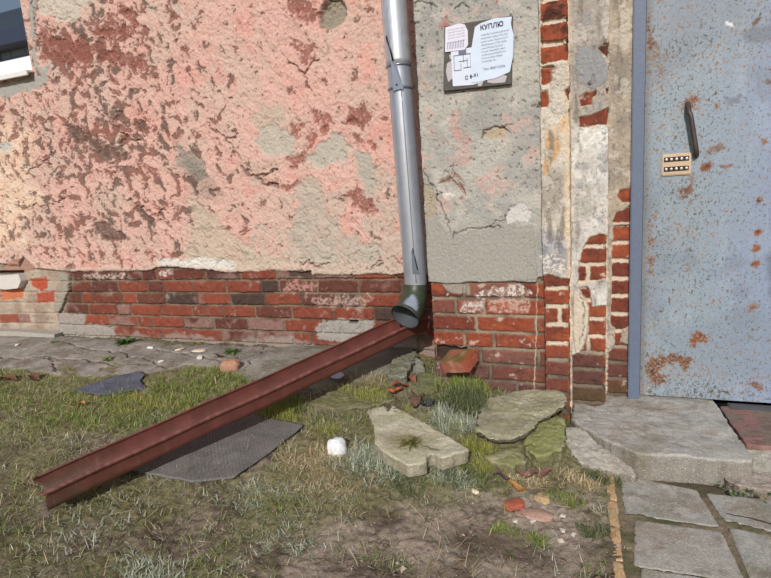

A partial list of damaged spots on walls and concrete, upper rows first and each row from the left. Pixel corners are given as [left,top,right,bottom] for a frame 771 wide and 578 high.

spalling [281,0,347,30]
spalling [536,0,571,109]
spalling [597,42,611,67]
crack [480,123,513,139]
spalling [564,86,609,129]
crack [422,165,507,239]
spalling [533,187,631,420]
rust [643,330,711,390]